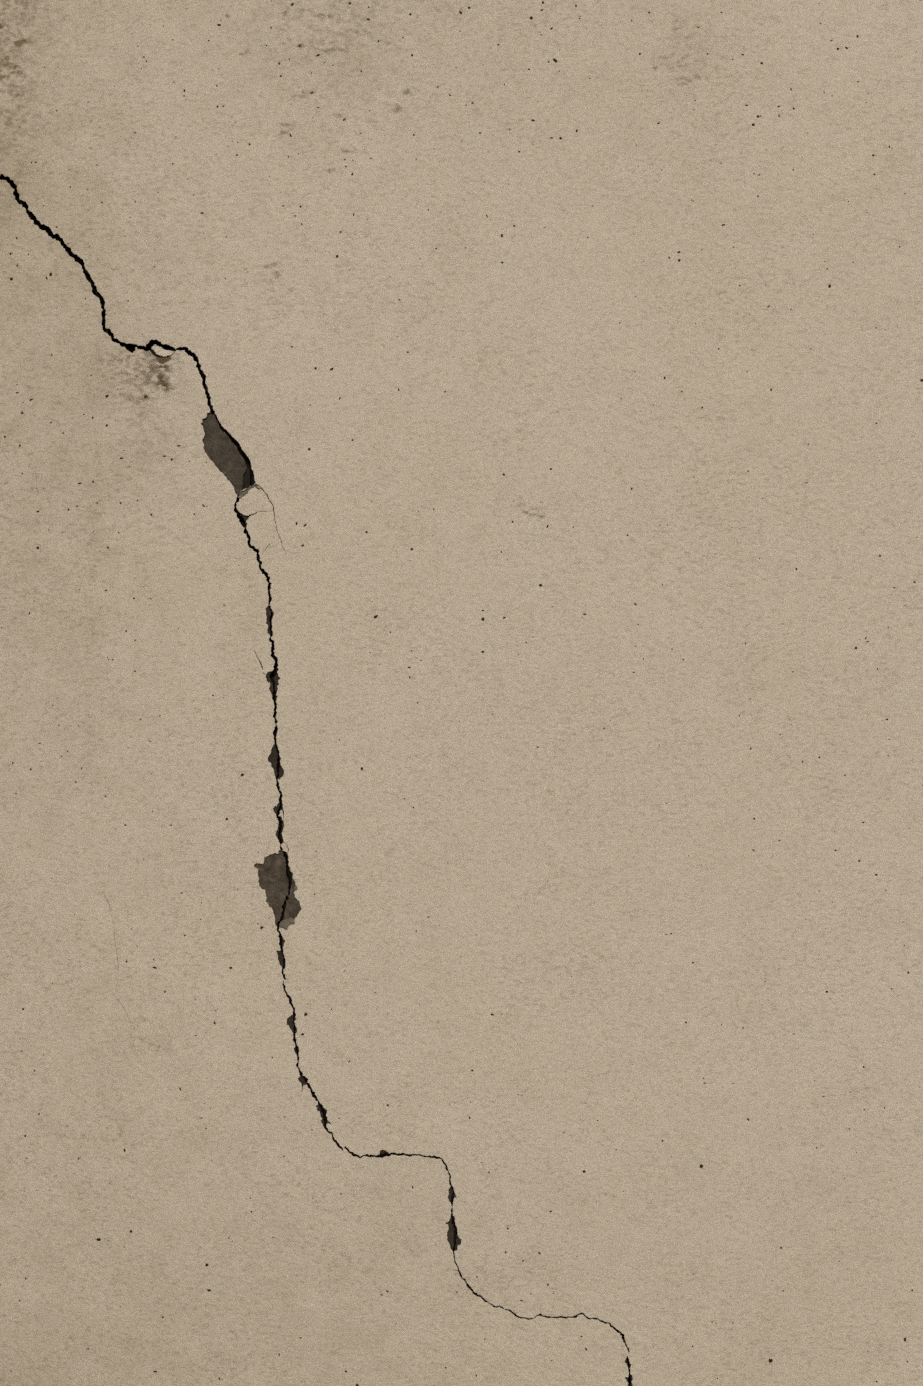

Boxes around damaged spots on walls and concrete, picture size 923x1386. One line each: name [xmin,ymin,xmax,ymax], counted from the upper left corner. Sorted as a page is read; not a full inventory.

spalling [200,412,261,525]
crack [0,174,631,1386]
spalling [254,802,302,969]